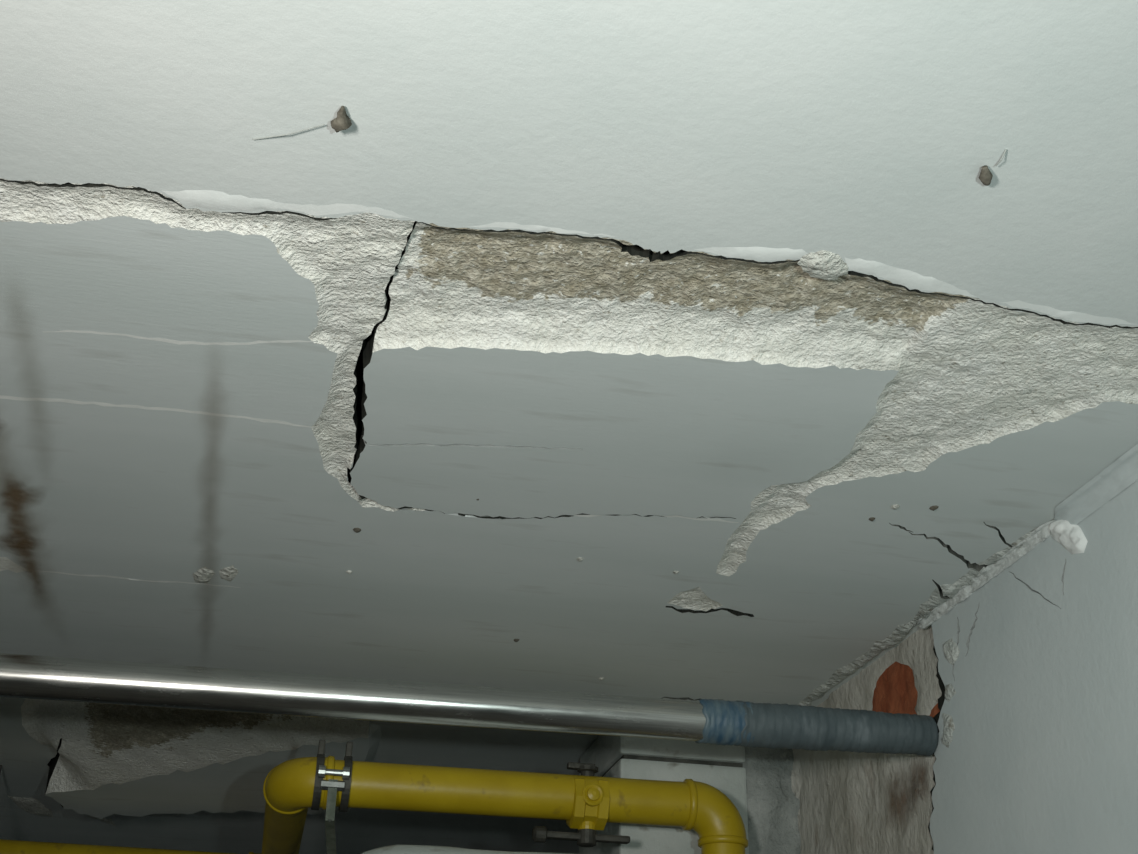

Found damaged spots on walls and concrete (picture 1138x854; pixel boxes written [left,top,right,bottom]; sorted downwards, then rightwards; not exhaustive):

crack [0,179,186,209]
crack [222,211,337,221]
crack [848,271,1138,329]
flaking render [0,178,1138,577]
crack [347,221,800,499]
crack [0,395,314,428]
crack [396,506,739,523]
crack [889,522,1066,609]
flaking render [668,587,722,611]
flaking render [21,699,370,794]